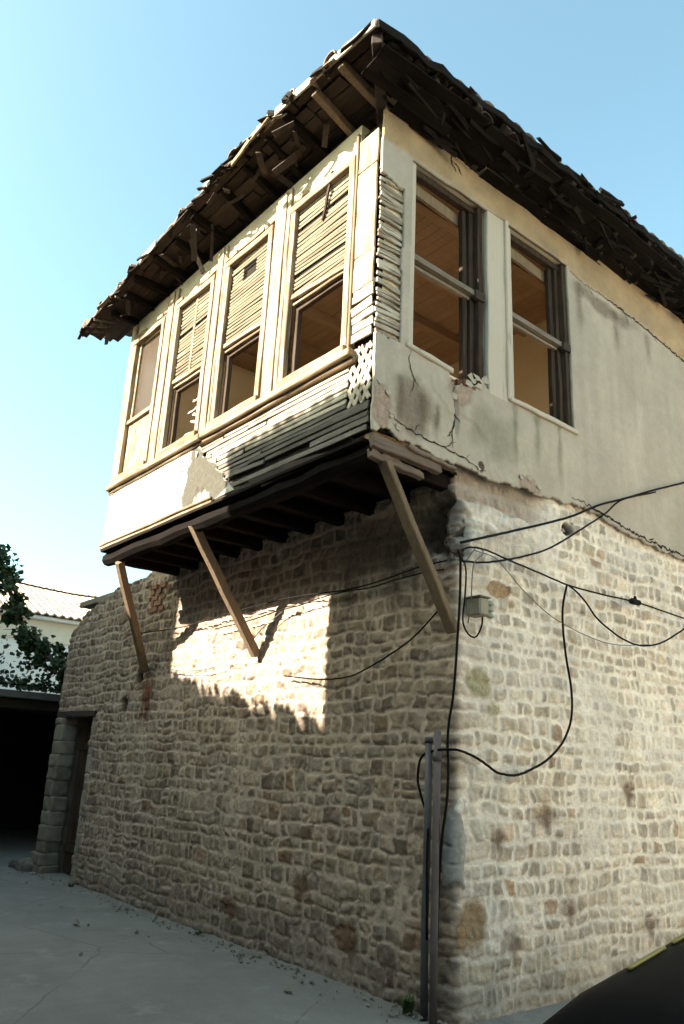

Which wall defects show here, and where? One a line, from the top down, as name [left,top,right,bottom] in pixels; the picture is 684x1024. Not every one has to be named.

peeling [466,373,489,389]
crack [387,387,486,471]
flaking render [180,447,228,509]
flaking render [520,474,541,495]